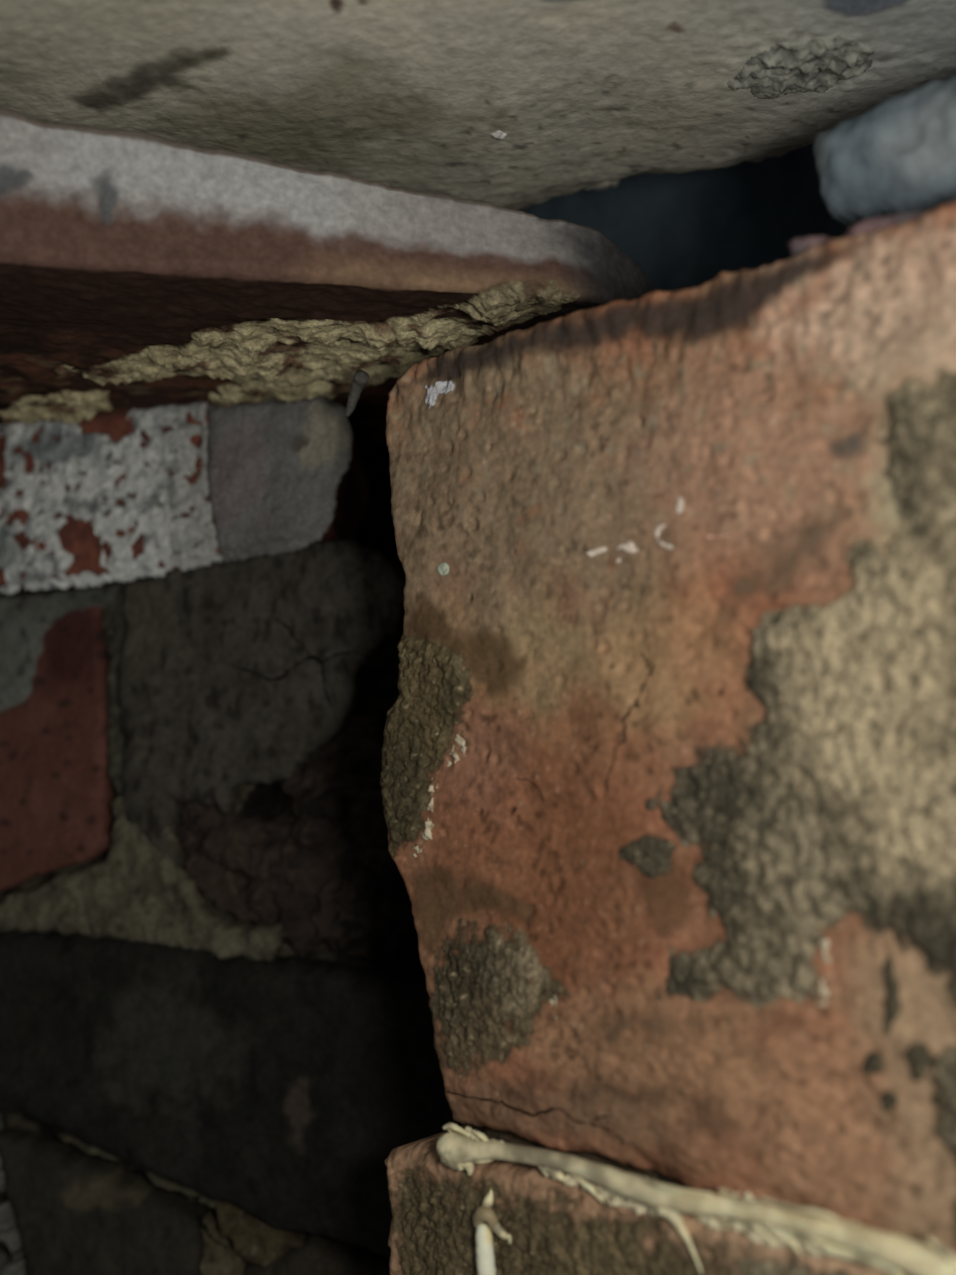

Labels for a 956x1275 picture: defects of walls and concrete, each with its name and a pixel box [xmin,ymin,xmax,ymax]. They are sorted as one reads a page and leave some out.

water stain [827,0,908,16]
spalling [727,35,874,99]
peeling [0,364,223,595]
crack [606,653,653,788]
water stain [817,929,832,1006]
crack [446,1091,623,1146]